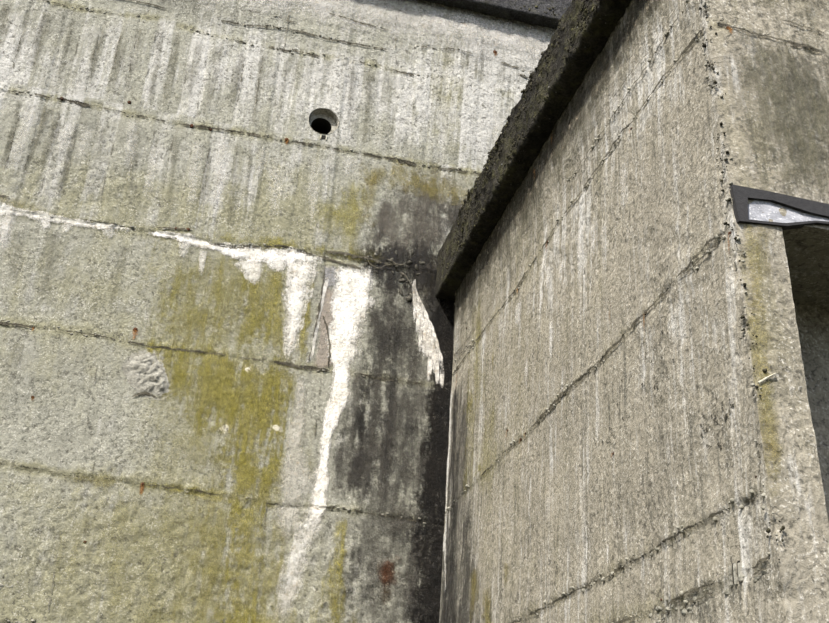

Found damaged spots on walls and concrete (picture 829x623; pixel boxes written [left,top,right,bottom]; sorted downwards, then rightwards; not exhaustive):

damp [0,204,124,238]
damp [149,0,656,623]
corrosion [380,561,395,602]